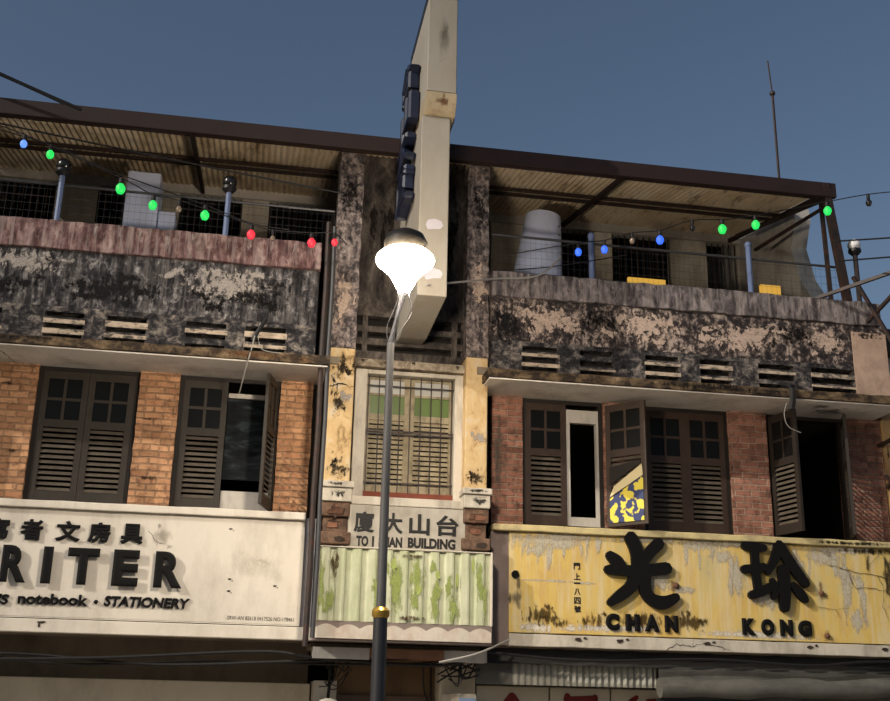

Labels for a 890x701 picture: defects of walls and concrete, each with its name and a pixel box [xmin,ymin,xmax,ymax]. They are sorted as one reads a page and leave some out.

leakage [447,212,459,286]
leakage [0,272,160,308]
leakage [191,276,297,313]
leakage [330,353,368,416]
leakage [326,451,349,497]
leakage [467,426,502,505]
peeling [387,557,460,622]
peeling [508,533,601,585]
peeling [638,537,745,597]
crack [829,551,890,621]
peeling [521,623,660,643]
peeling [704,630,818,649]